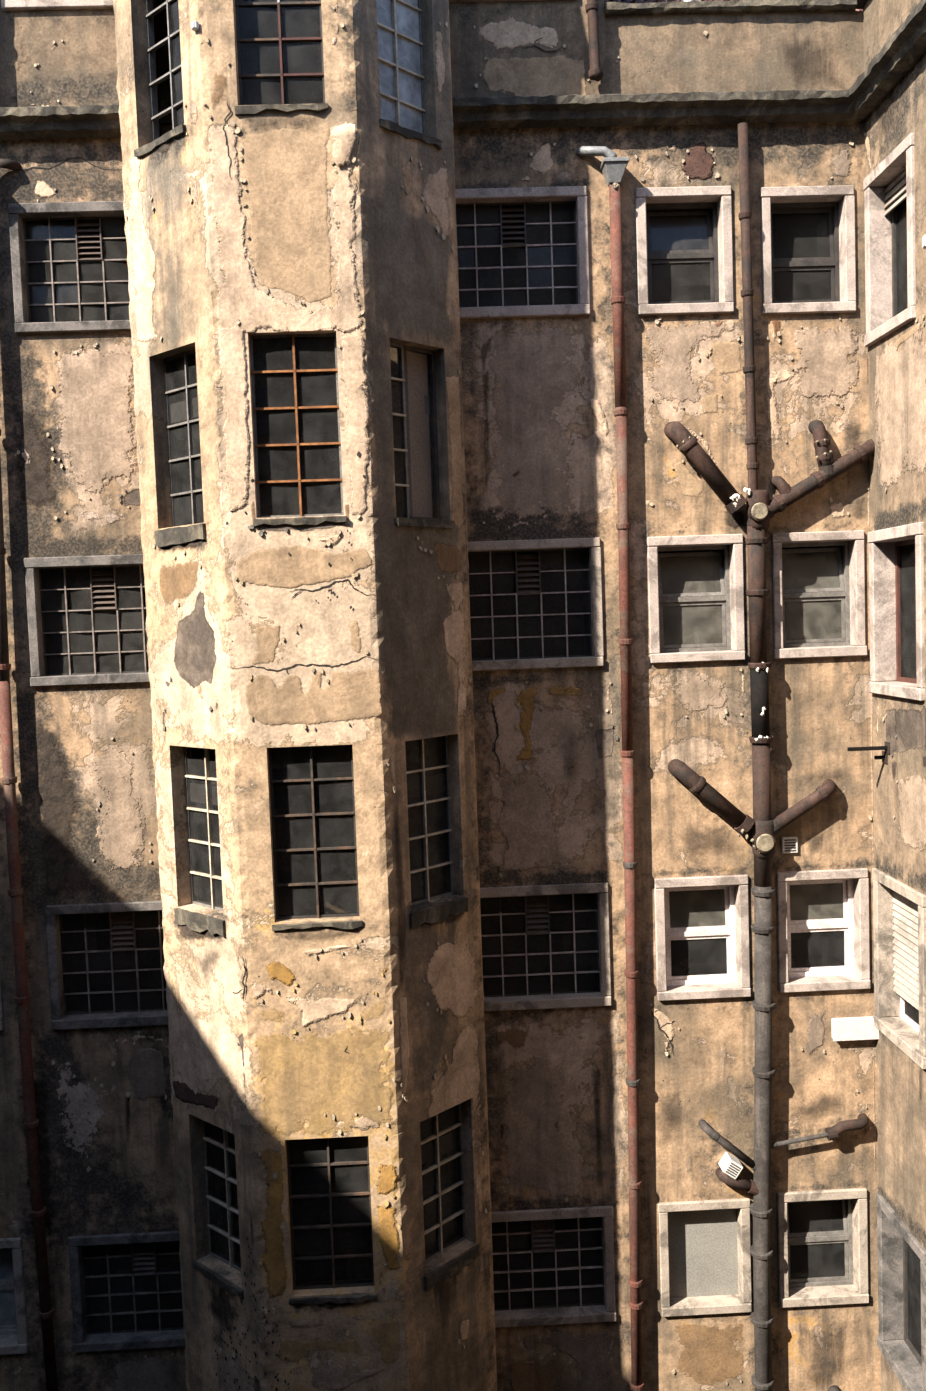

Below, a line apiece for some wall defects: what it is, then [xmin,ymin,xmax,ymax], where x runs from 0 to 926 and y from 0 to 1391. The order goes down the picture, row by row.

flaking render [435,22,448,93]
flaking render [474,15,590,97]
crack [223,100,232,180]
crack [353,122,364,208]
spalling [665,142,720,180]
leakage [13,404,130,524]
flaking render [159,556,216,688]
crack [290,579,374,599]
leakage [36,723,92,895]
flaking render [423,941,481,1119]
spalling [212,1212,292,1391]